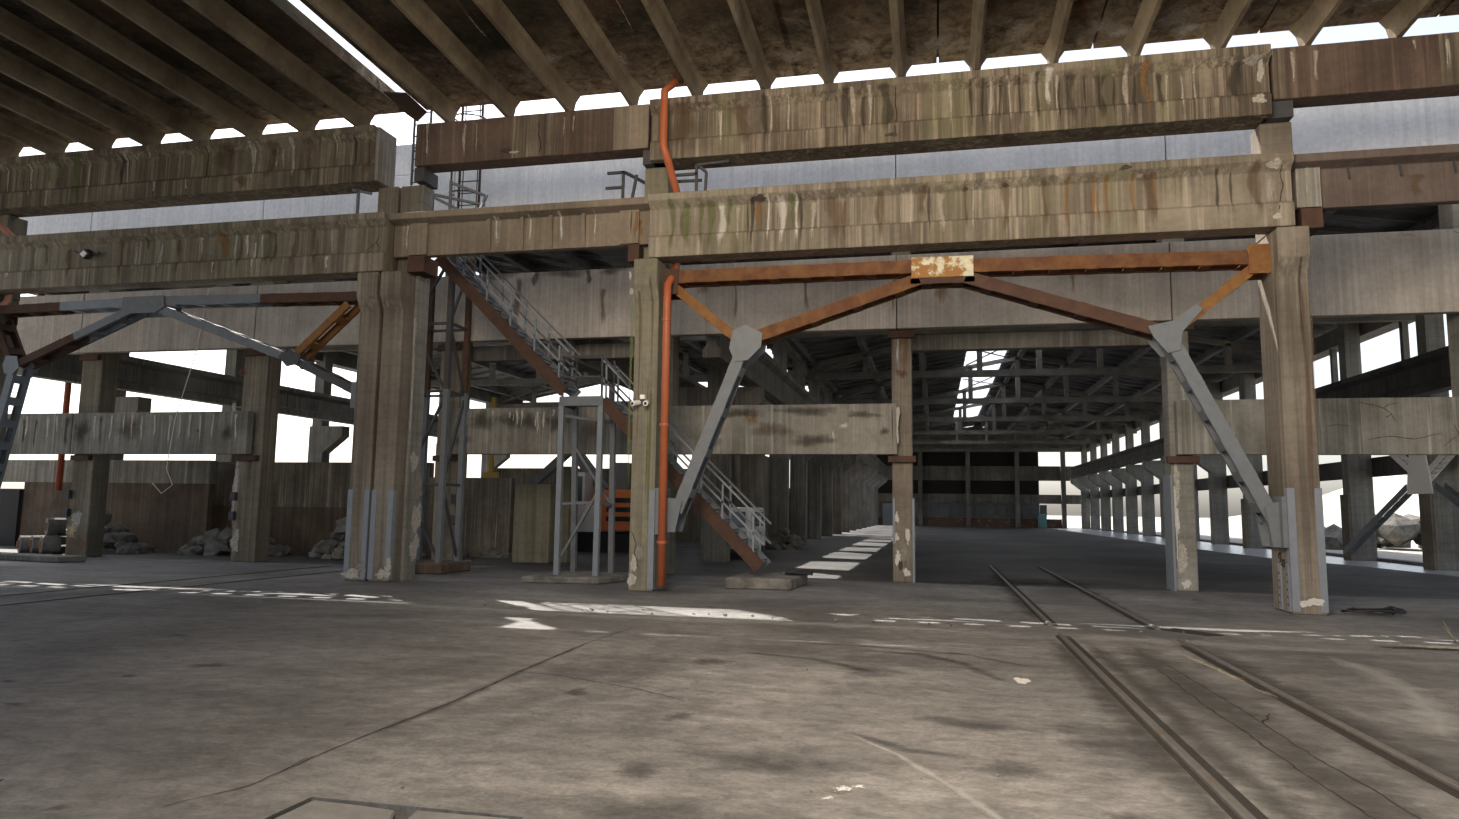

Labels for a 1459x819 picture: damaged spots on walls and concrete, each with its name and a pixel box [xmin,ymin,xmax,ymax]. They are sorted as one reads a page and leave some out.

leakage [718,95,790,140]
leakage [842,84,892,126]
leakage [949,67,1136,116]
leakage [1157,66,1196,104]
leakage [185,136,311,189]
leakage [669,195,846,240]
leakage [910,186,945,225]
spalling [409,451,423,562]
spalling [340,557,391,580]